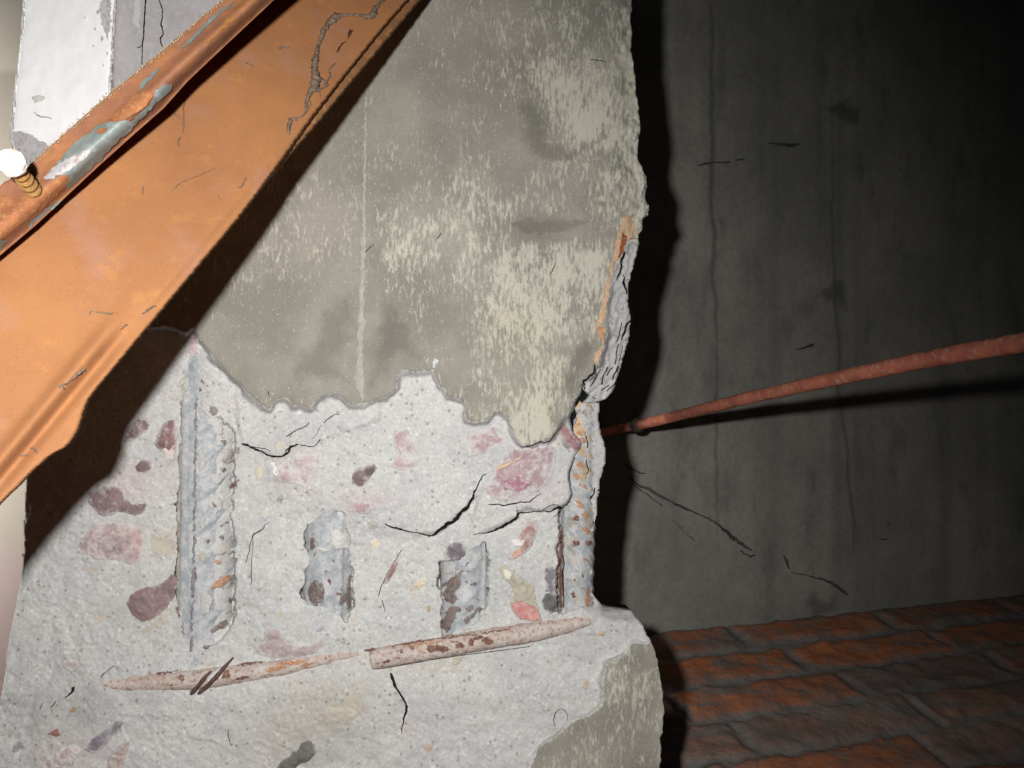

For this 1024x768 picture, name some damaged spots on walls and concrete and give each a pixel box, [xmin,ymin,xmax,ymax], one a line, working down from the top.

corrosion [96,89,153,134]
corrosion [0,175,69,239]
corrosion [594,215,638,365]
crack [617,251,627,294]
crack [242,414,340,458]
spalling [0,241,650,768]
corrosion [303,559,352,609]
corrosion [364,562,510,664]
crack [378,321,630,612]
corrosion [557,500,592,609]
crack [625,464,756,558]
crack [382,646,530,734]